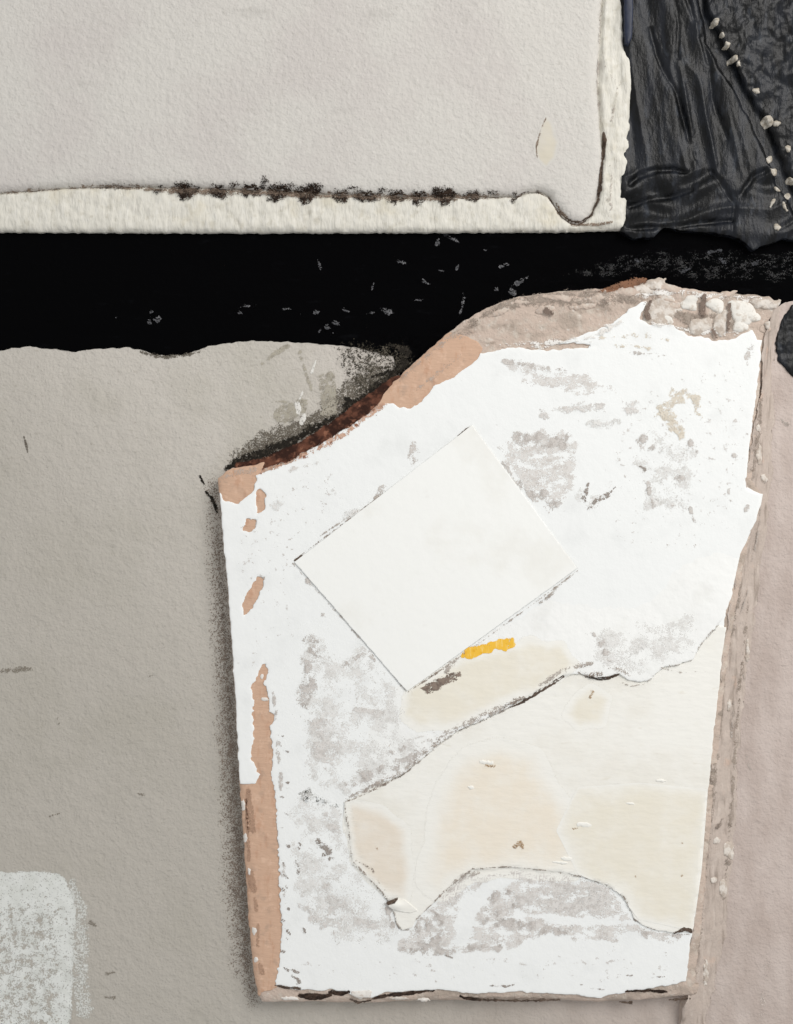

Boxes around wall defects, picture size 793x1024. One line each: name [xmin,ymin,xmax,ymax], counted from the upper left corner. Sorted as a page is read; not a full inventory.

peeling [218,462,283,532]
peeling [261,344,338,425]
peeling [498,359,641,513]
spalling [378,248,793,409]
peeling [633,388,703,521]
damp [562,683,612,731]
peeling [239,634,699,1005]
damp [342,736,719,973]